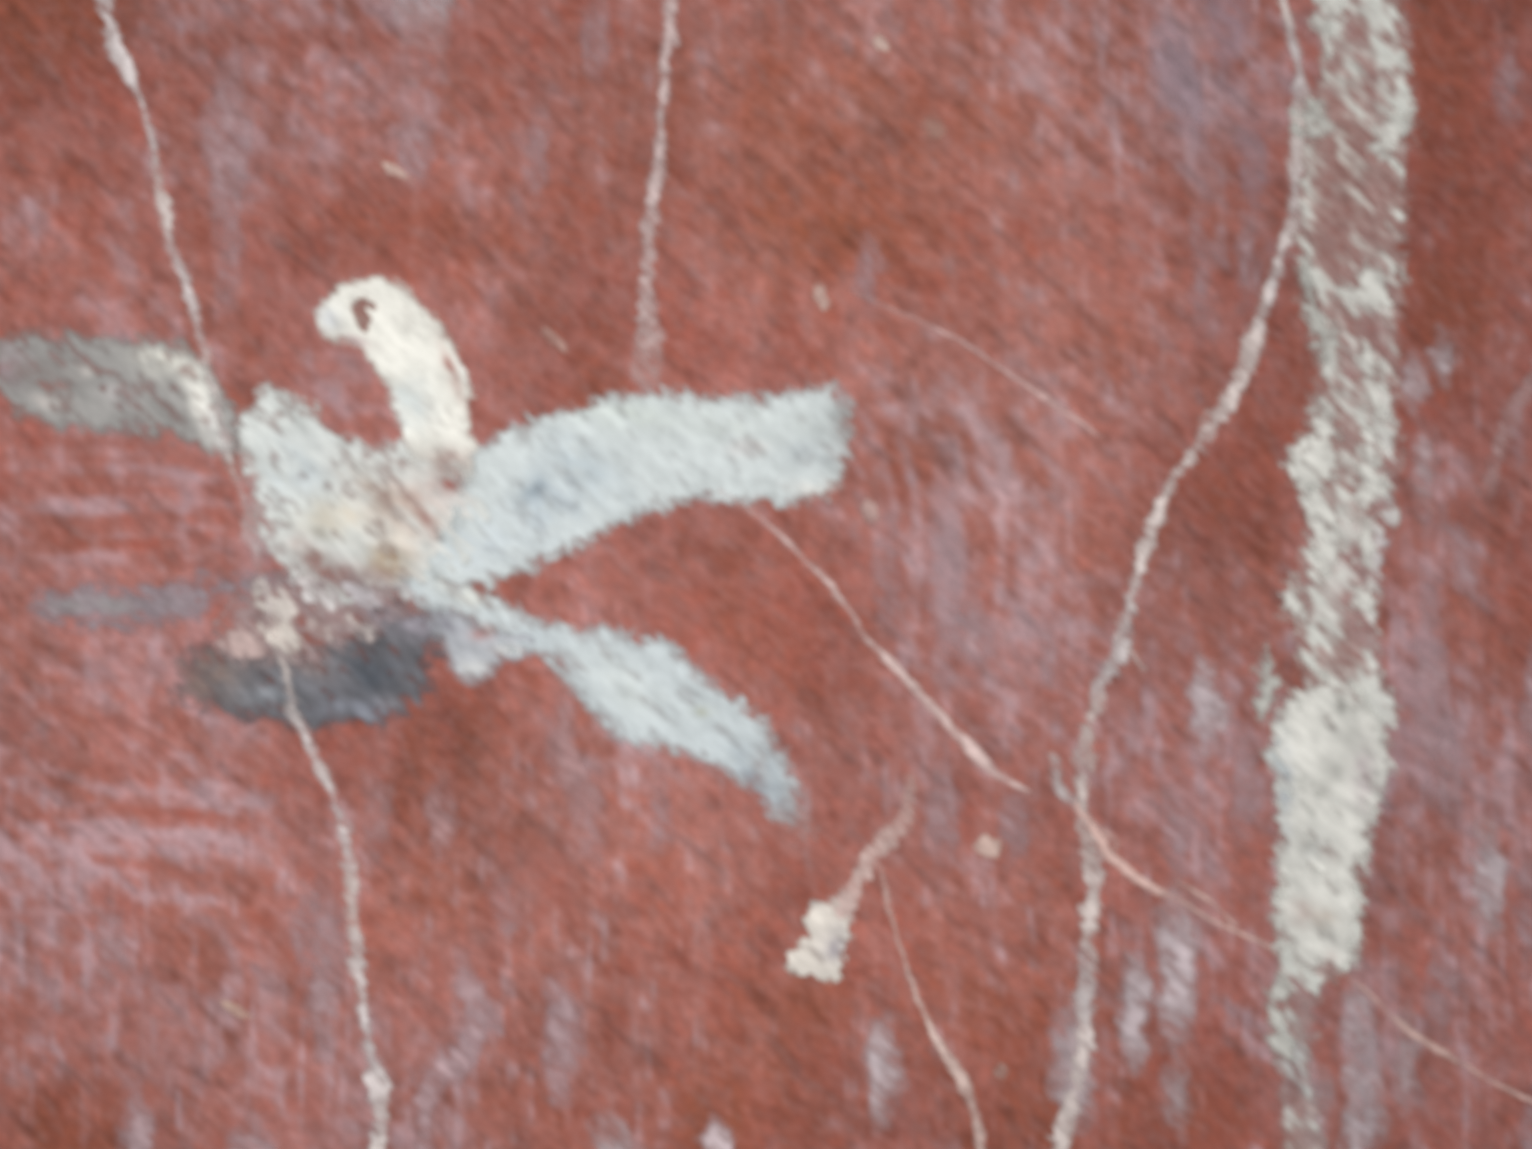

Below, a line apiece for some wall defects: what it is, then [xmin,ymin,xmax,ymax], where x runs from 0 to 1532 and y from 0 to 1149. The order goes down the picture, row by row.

crack [100,0,232,463]
crack [637,0,678,347]
crack [776,532,845,604]
crack [866,0,1310,1149]
crack [280,659,392,1149]
leakage [1343,1067,1378,1149]
crack [1360,986,1532,1102]